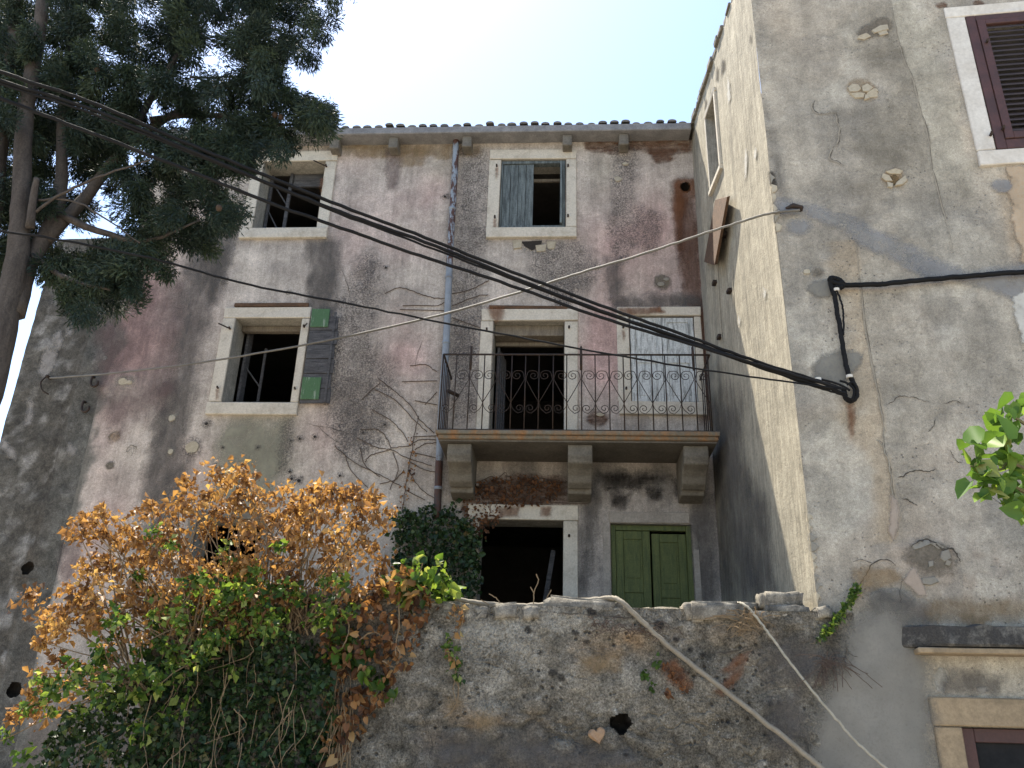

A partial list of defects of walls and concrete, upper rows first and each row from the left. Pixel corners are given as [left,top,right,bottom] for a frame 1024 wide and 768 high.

spalling [857,18,889,40]
crack [811,100,842,166]
spalling [881,168,907,188]
peeling [1006,166,1024,262]
spalling [512,240,557,253]
corrosion [672,179,709,418]
peeling [1013,292,1024,343]
crack [853,243,963,603]
spalling [21,561,34,575]
spalling [904,538,961,596]
spalling [6,682,22,698]
spalling [610,713,633,735]